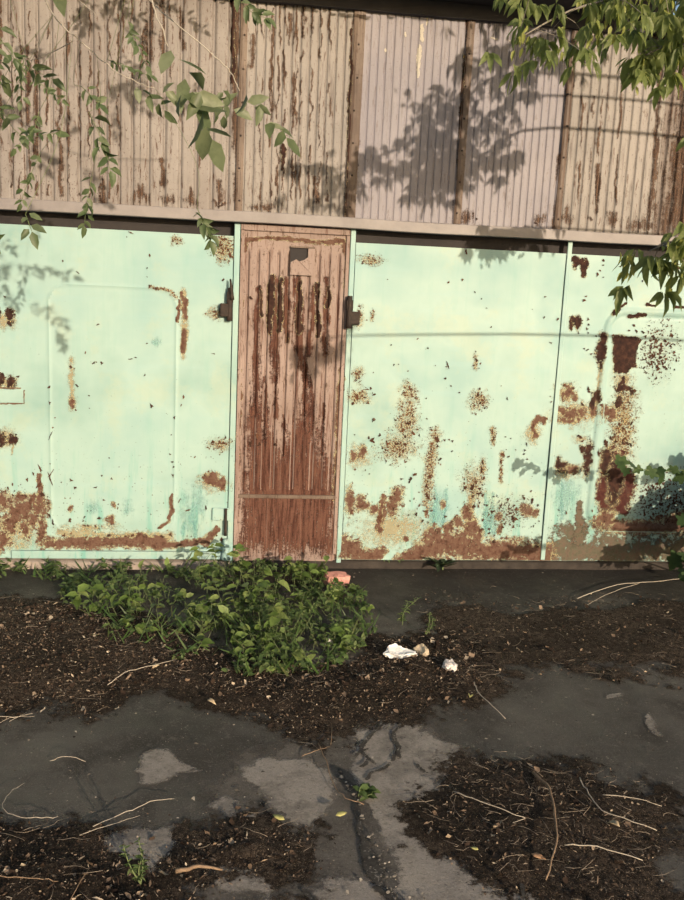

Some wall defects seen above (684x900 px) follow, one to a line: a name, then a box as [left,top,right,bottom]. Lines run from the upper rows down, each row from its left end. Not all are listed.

rust [0,0,185,204]
rust [133,157,199,207]
rust [212,0,332,212]
rust [343,10,364,218]
rust [534,66,684,235]
rust [206,236,387,288]
rust [571,256,589,279]
rust [149,284,190,358]
rust [0,430,18,455]
rust [0,372,25,405]
rust [199,274,684,561]
rust [0,465,223,554]